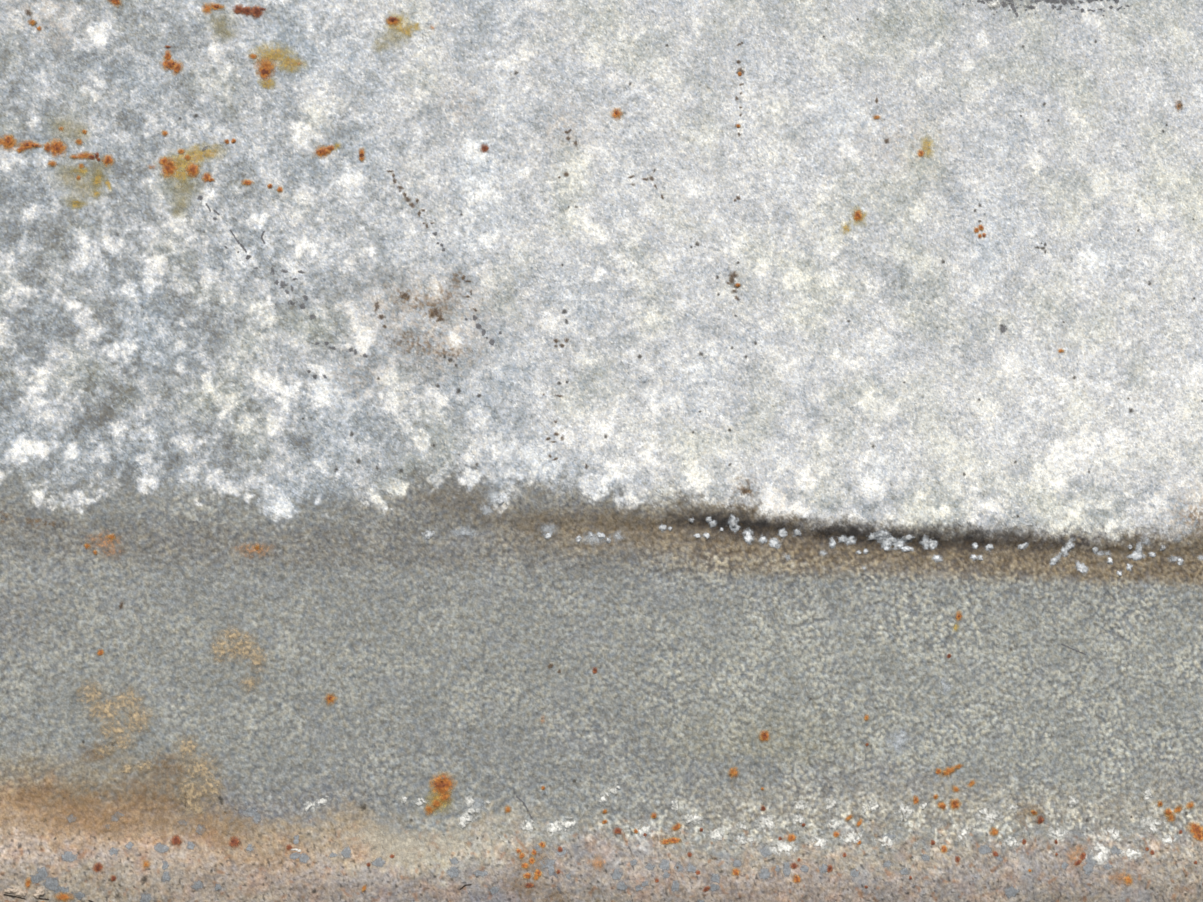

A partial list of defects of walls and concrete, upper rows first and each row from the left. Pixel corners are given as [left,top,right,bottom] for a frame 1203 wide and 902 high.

rust [203,3,265,36]
rust [378,16,434,49]
rust [250,49,300,89]
rust [0,122,113,207]
rust [150,139,236,207]
rust [401,774,453,815]
rust [459,796,490,827]
rust [517,817,576,888]
rust [599,782,656,837]
rust [662,799,895,882]
rust [895,764,975,820]
rust [931,789,1203,865]